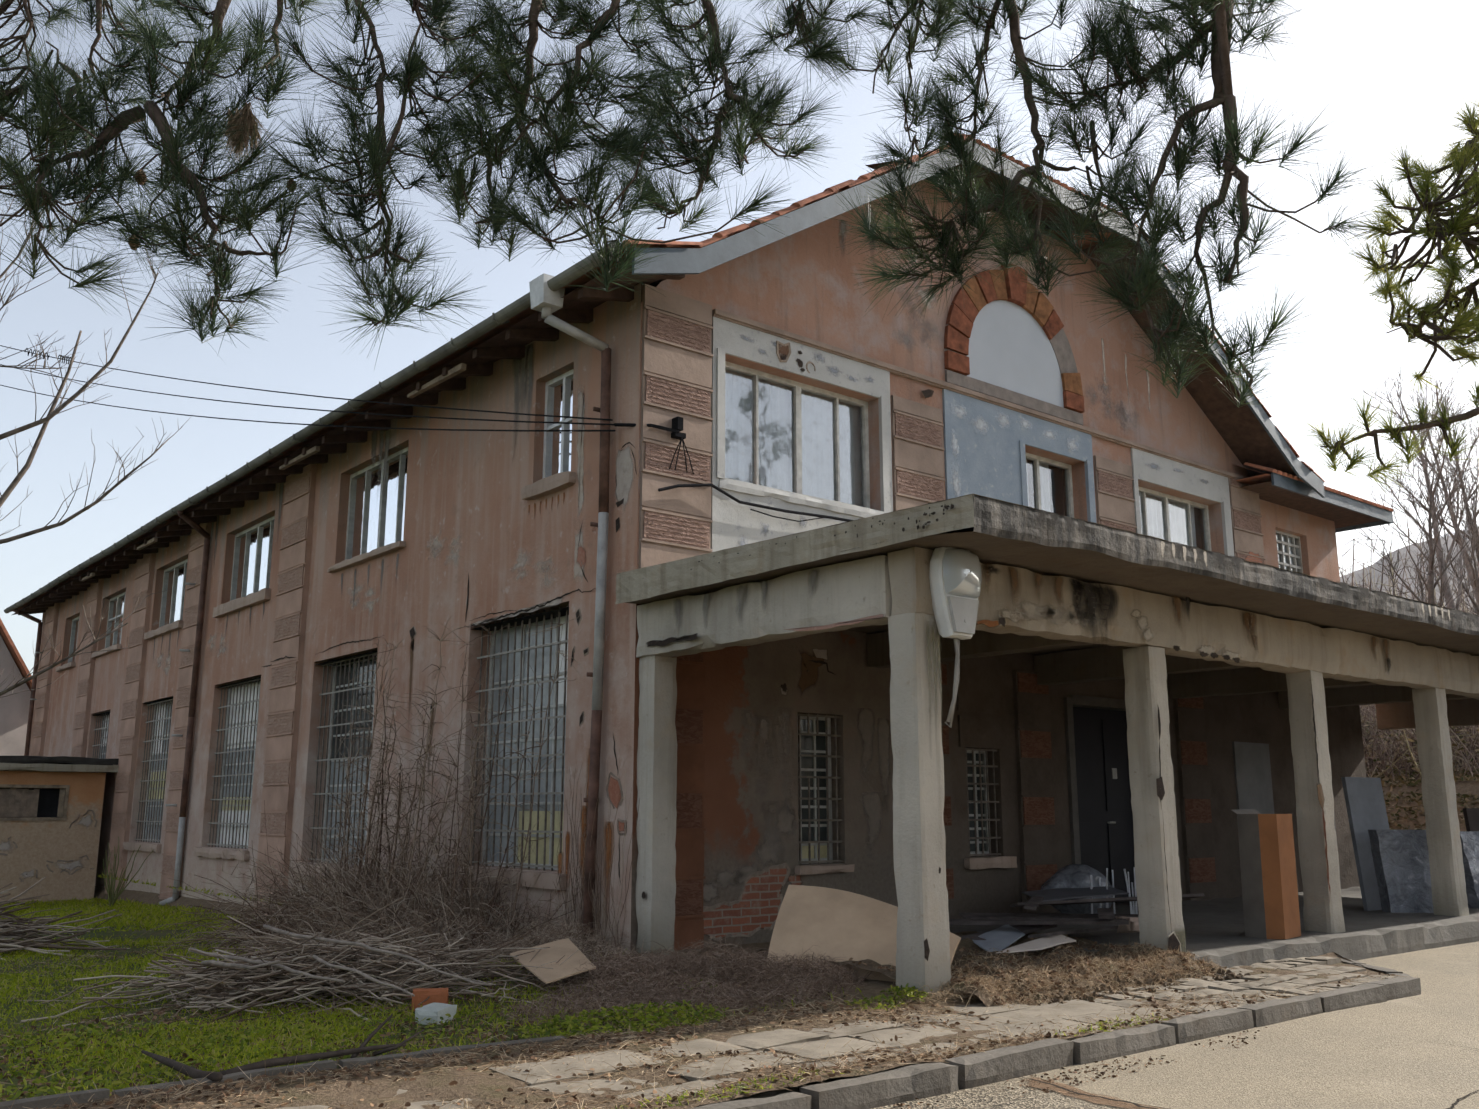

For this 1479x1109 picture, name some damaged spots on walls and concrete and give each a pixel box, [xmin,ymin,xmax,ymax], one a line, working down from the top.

leakage [985,564,1118,632]
crack [1020,1076,1168,1109]
crack [1446,1090,1479,1109]